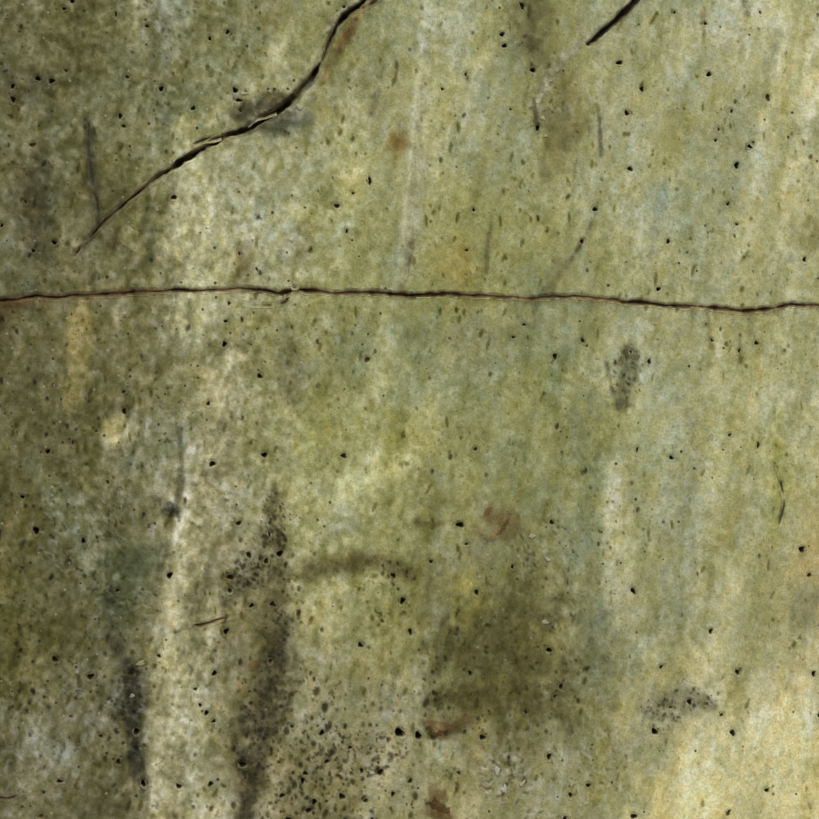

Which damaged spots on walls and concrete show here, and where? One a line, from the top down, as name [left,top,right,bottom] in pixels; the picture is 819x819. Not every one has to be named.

crack [0,0,819,316]
water stain [612,345,639,409]
rust [475,503,521,540]
water stain [264,620,289,670]
water stain [427,595,574,745]
water stain [235,679,291,819]
rust [424,788,454,819]